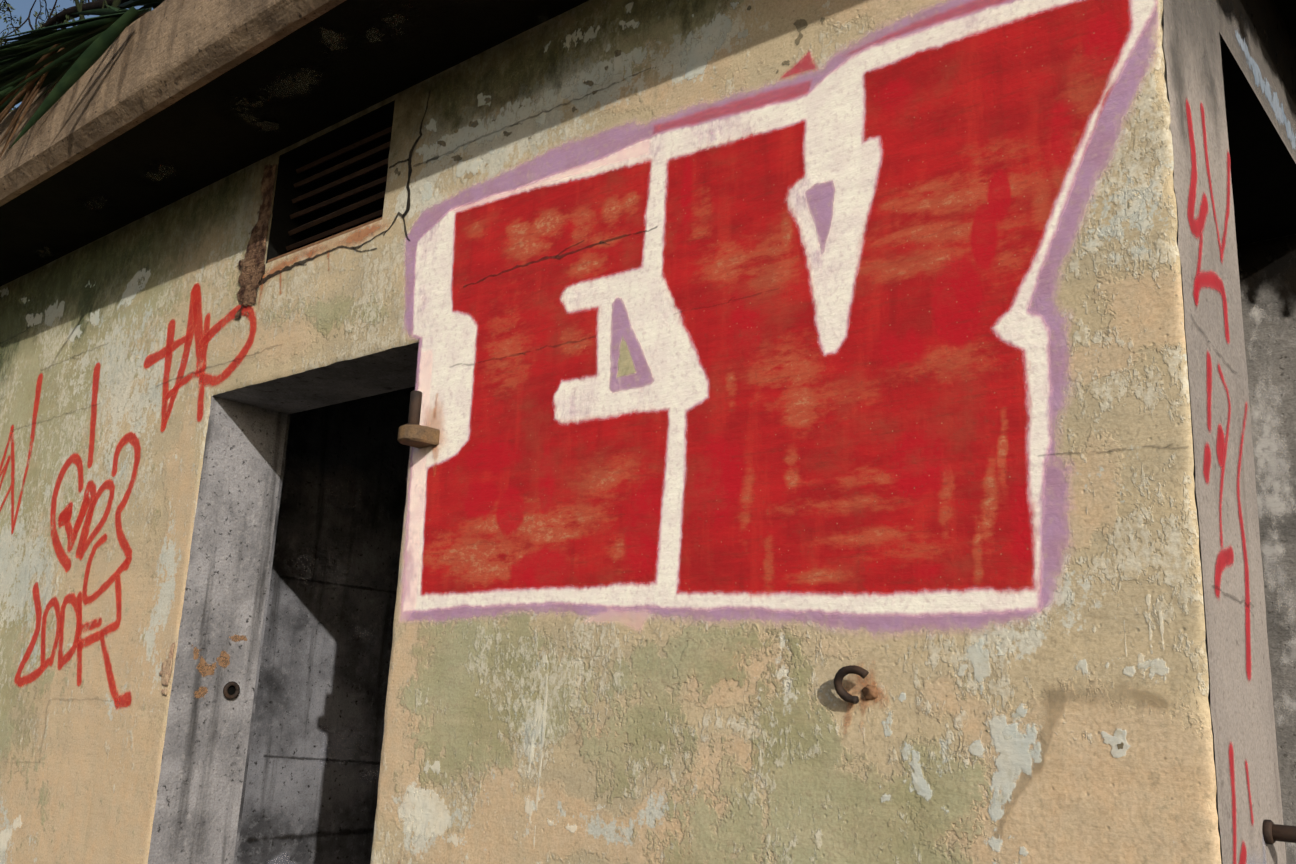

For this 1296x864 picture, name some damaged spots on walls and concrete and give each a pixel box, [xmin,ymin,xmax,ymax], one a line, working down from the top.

peeling [619,2,640,30]
peeling [680,2,751,80]
peeling [793,18,825,45]
peeling [416,26,650,179]
crack [259,91,431,286]
spalling [235,164,277,319]
peeling [0,287,100,342]
peeling [117,268,151,310]
peeling [398,760,465,847]
peeling [968,704,1042,864]